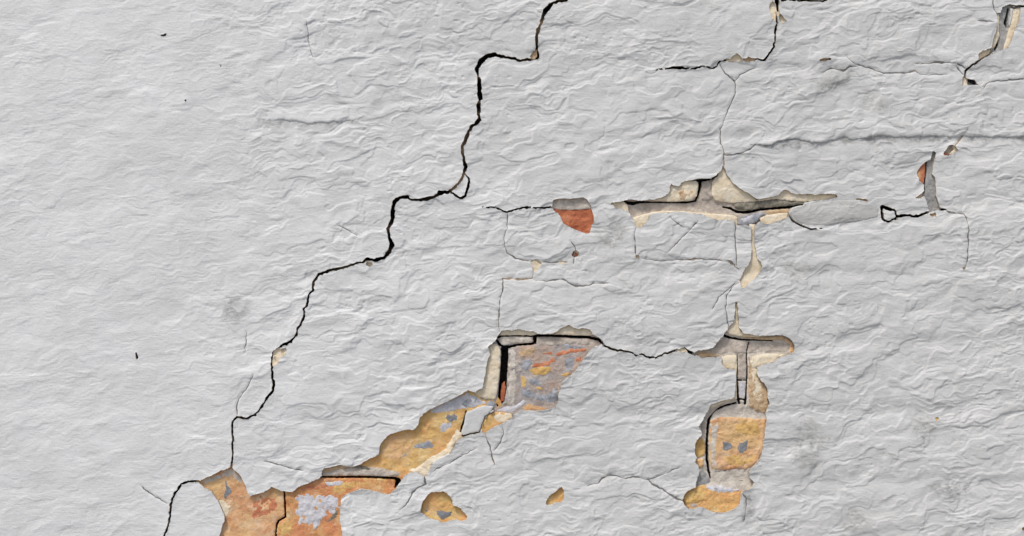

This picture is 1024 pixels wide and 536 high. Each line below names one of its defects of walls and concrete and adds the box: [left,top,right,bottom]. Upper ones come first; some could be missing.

spalling [976,5,1021,62]
crack [660,0,826,168]
crack [231,0,607,463]
spalling [550,198,594,234]
spalling [611,166,836,288]
crack [880,205,970,267]
spalling [916,145,957,213]
crack [593,338,692,358]
crack [141,480,196,536]
spalling [196,325,605,536]
crack [401,427,504,509]
spalling [683,302,794,512]